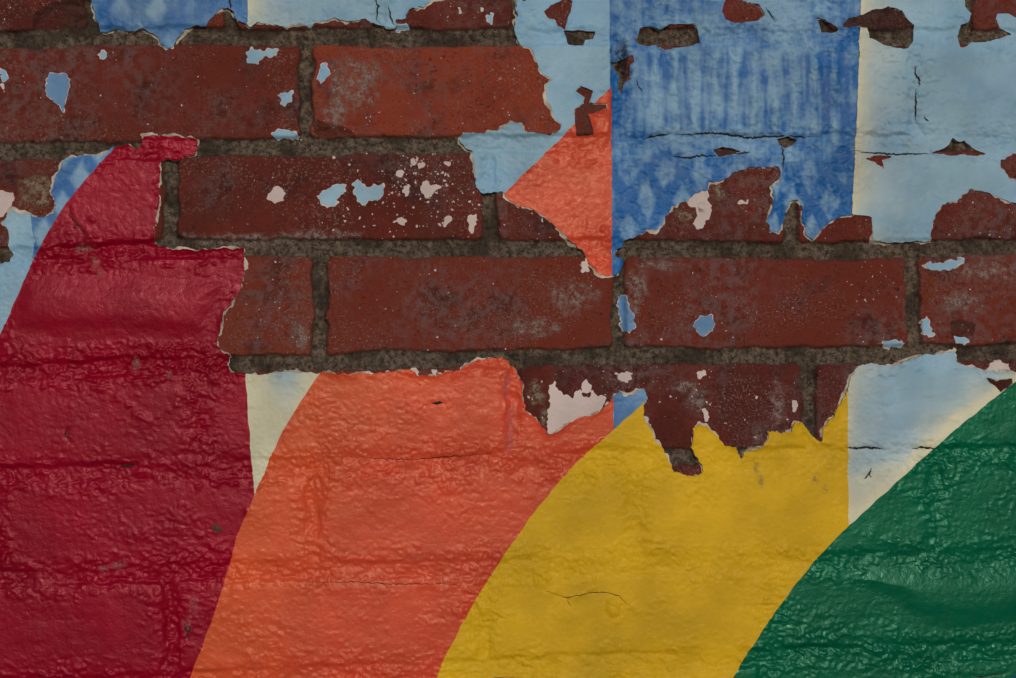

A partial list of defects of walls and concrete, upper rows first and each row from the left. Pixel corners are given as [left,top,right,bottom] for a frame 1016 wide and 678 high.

peeling [0,0,1016,476]
crack [915,66,929,124]